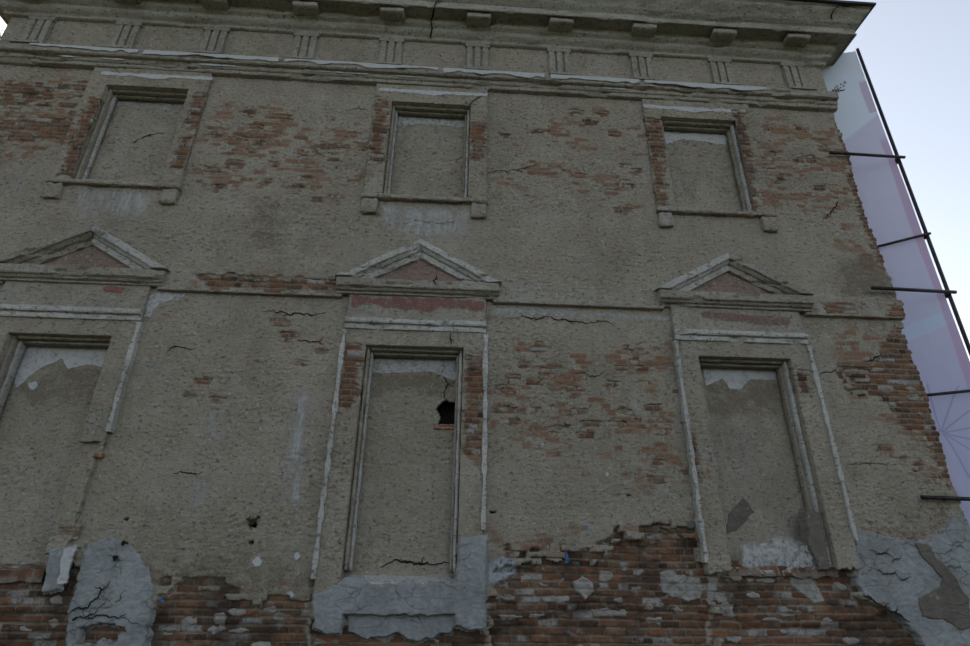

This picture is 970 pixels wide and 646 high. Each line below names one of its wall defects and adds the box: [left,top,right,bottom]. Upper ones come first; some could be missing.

flaking render [29,43,768,171]
crack [262,310,326,319]
crack [509,313,615,326]
peeling [14,346,108,390]
flaking render [338,340,550,458]
flaking render [836,300,954,490]
flaking render [0,561,80,646]
crack [64,581,144,627]
crack [381,557,450,568]
flaking render [151,524,915,646]
crack [863,594,910,622]
crack [869,547,912,581]